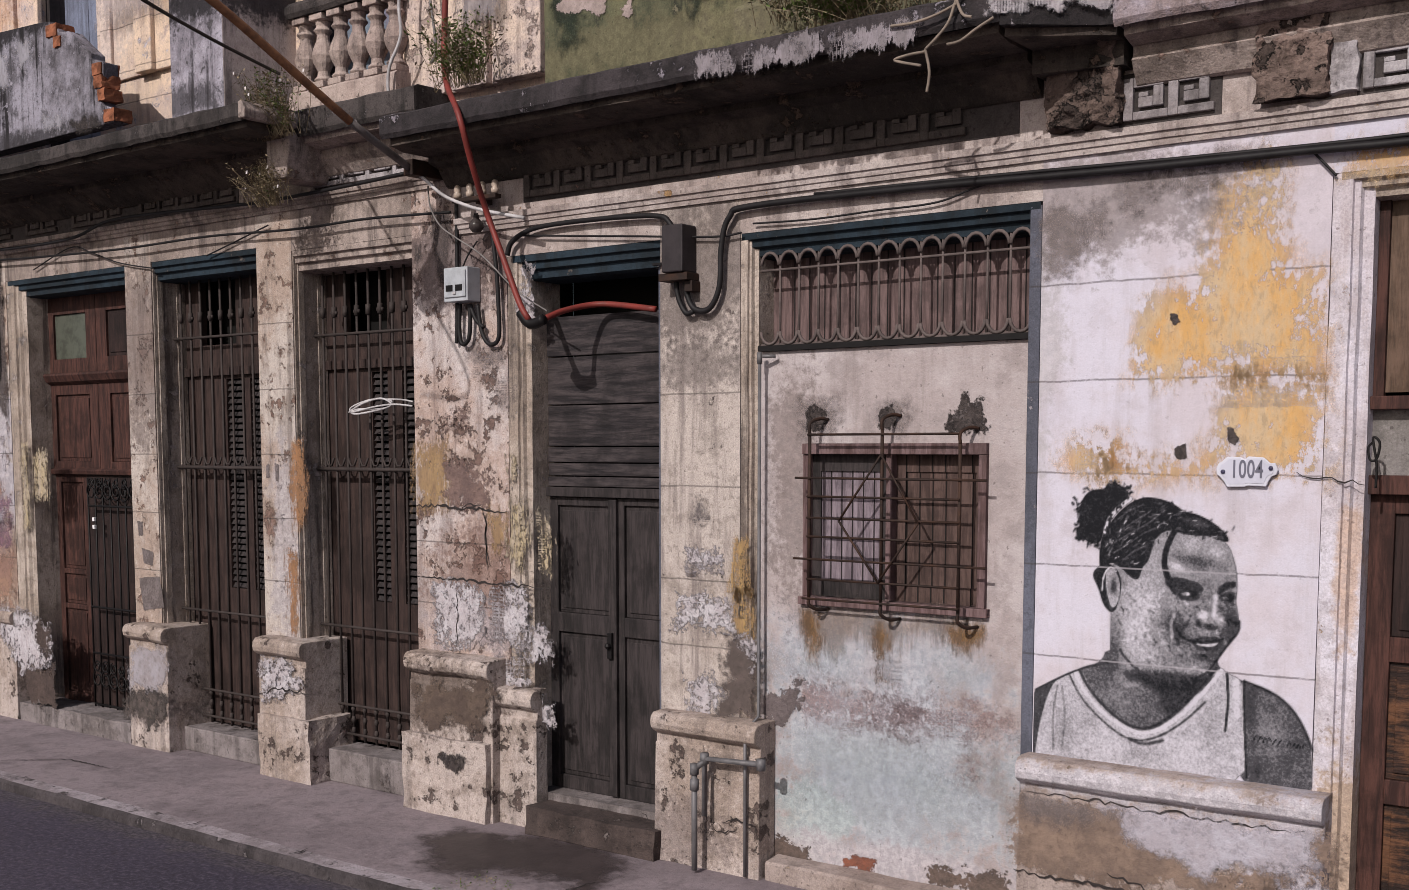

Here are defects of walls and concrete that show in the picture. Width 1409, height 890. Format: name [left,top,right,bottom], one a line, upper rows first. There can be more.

spalling [91,62,133,126]
peeling [1068,145,1331,485]
spalling [944,391,990,437]
peeling [0,439,50,549]
peeling [410,406,559,735]
peeling [0,603,58,717]
rust [802,610,823,659]
rust [872,622,888,681]
rust [948,621,985,653]
spalling [438,752,467,774]
crack [1026,791,1304,833]
crack [1014,869,1145,890]